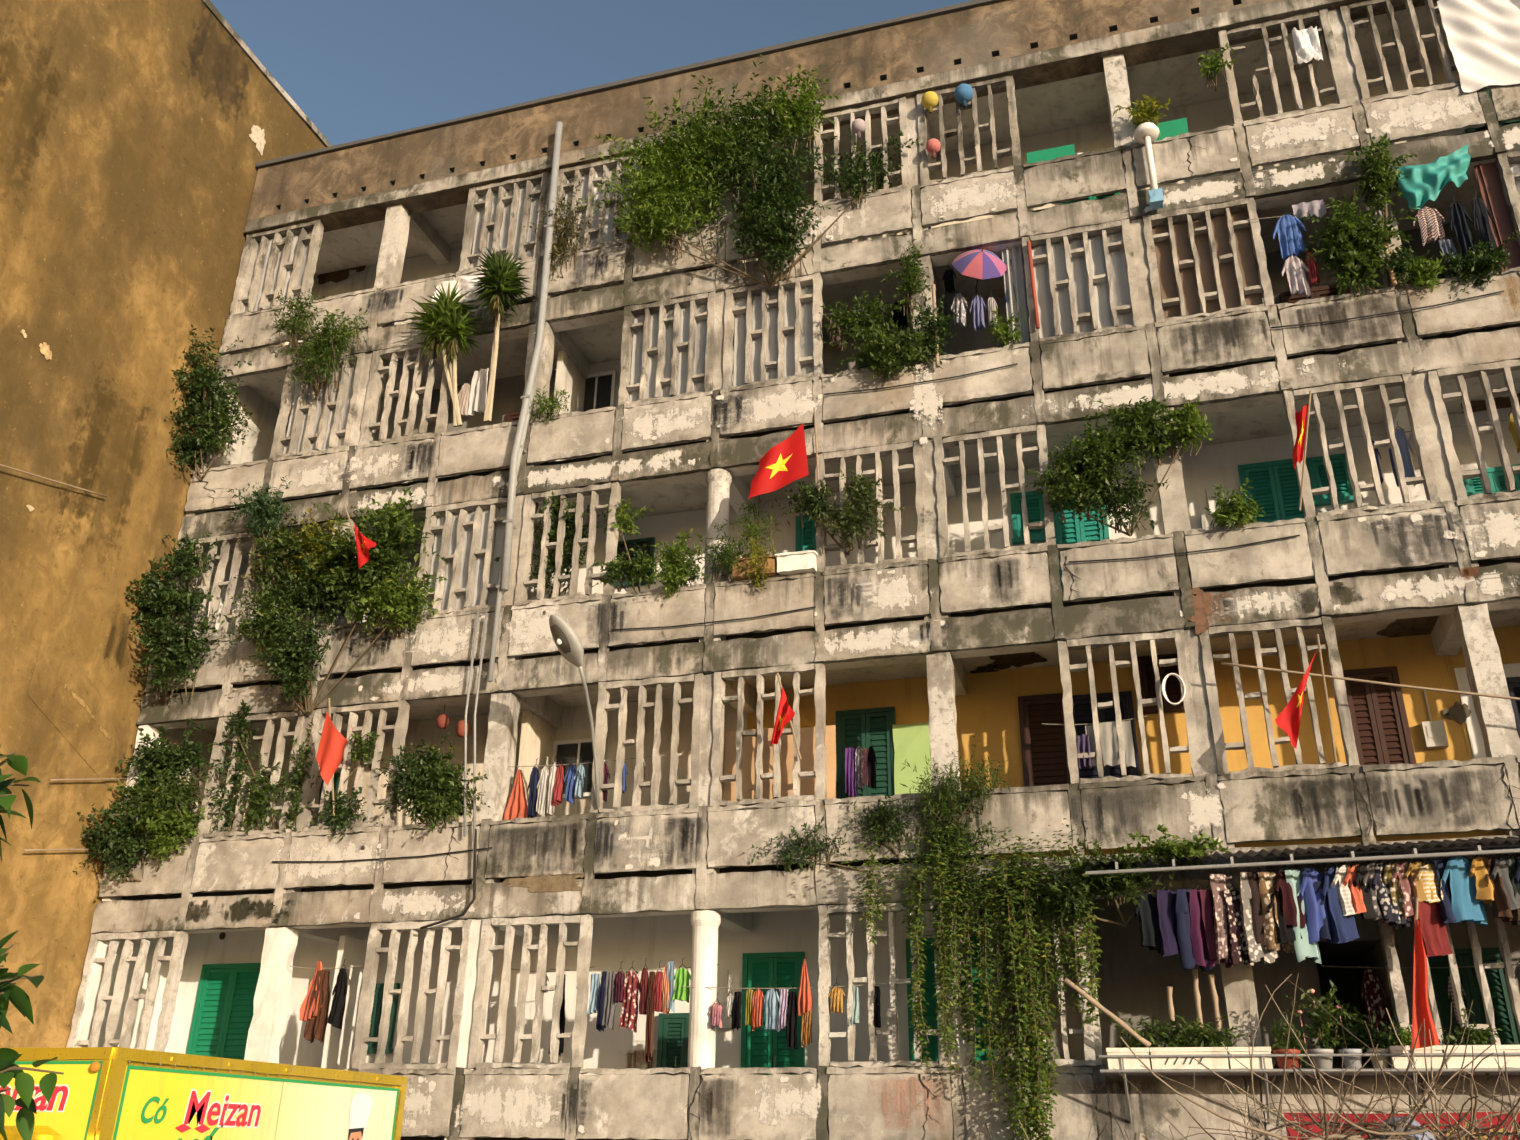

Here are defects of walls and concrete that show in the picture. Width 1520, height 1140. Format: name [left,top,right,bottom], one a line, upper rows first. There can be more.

spalling [249,125,266,155]
spalling [20,329,52,360]
peeling [910,364,944,444]
spalling [1459,393,1520,414]
peeling [492,378,835,494]
peeling [1358,507,1520,638]
spalling [970,652,1048,674]
leakage [1288,772,1486,830]
mould [174,897,291,924]
crack [916,1074,939,1139]